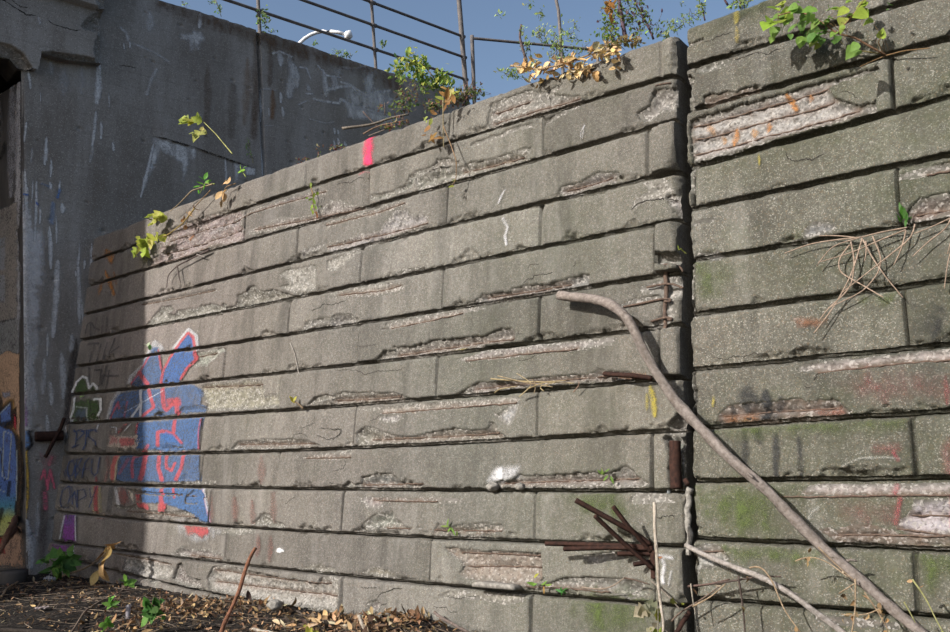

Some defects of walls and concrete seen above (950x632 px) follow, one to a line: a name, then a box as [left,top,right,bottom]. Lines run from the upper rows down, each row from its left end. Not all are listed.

spalling [632,60,880,229]
spalling [141,148,532,328]
spalling [908,193,950,228]
spalling [377,329,617,363]
spalling [797,349,950,374]
spalling [233,368,635,460]
spalling [719,398,853,428]
spalling [342,473,648,605]
rust [544,498,662,579]